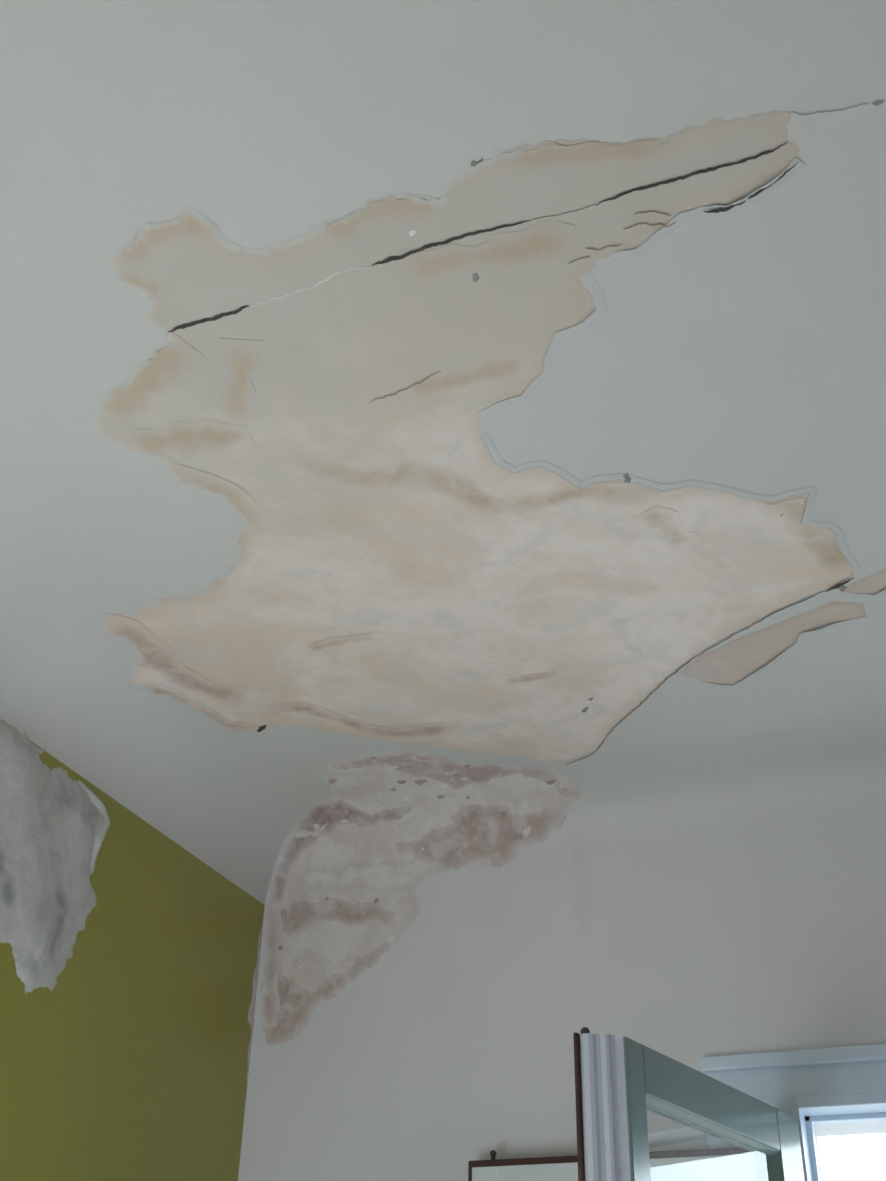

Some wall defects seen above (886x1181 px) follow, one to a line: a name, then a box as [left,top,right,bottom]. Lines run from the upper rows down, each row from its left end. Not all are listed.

crack [167,142,787,333]
crack [788,103,865,115]
water stain [100,330,700,613]
peeling [91,109,886,762]
water stain [758,496,854,576]
peeling [0,718,111,994]
water stain [101,615,585,1045]